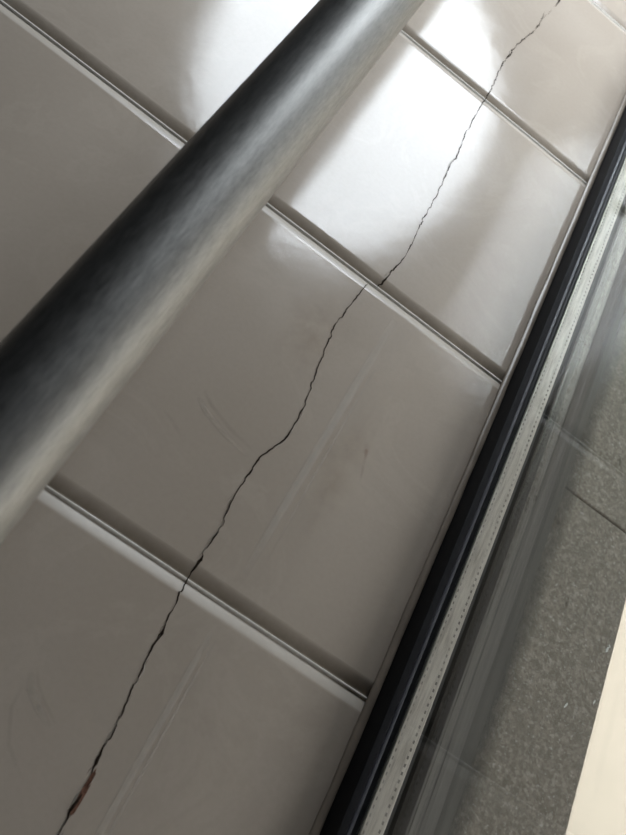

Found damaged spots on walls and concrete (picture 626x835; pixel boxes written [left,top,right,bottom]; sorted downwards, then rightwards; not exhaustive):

crack [88,0,560,774]
crack [55,801,76,835]